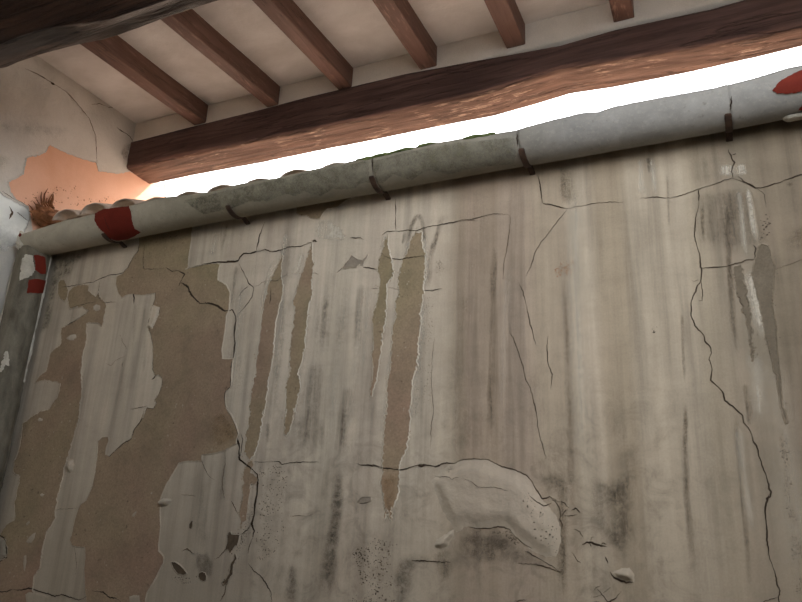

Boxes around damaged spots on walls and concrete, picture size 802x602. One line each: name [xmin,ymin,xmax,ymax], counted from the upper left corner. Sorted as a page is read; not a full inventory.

peeling [0,279,107,602]
peeling [7,144,166,231]
peeling [69,227,315,602]
peeling [342,231,430,521]
crack [363,177,621,454]
crack [359,458,632,602]
crack [643,149,802,602]